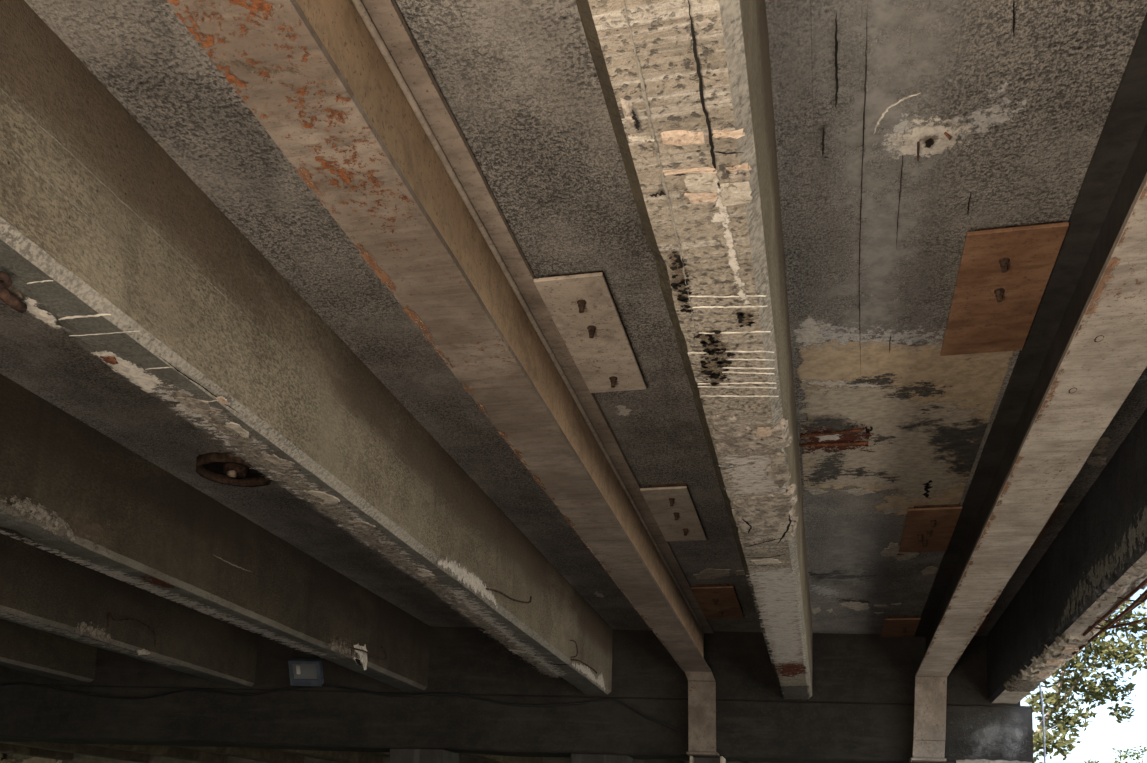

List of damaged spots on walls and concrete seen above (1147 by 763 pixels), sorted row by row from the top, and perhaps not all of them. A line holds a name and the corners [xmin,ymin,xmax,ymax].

rust [165,0,417,293]
spalling [620,98,745,146]
crack [688,0,744,186]
crack [819,2,868,371]
spalling [874,80,1029,162]
water stain [0,530,338,667]
spalling [93,351,562,678]
water stain [151,385,567,677]
water stain [698,350,778,397]
rust [773,663,807,677]
water stain [801,373,988,477]
spalling [1003,505,1147,692]